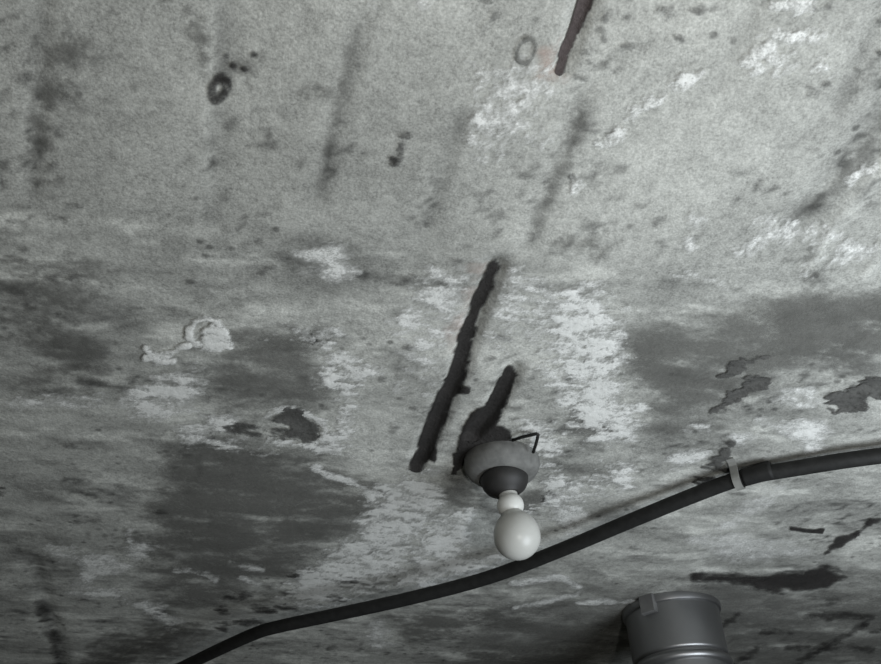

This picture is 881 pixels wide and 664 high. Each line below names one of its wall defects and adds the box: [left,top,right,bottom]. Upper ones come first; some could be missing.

water stain [467,65,554,163]
water stain [595,96,665,148]
water stain [668,71,706,92]
water stain [734,216,881,265]
water stain [387,266,470,380]
water stain [5,392,102,408]
spalling [223,408,319,443]
crack [409,259,518,475]
water stain [482,266,881,535]
spalling [824,377,881,415]
water stain [45,327,505,664]
spalling [691,519,881,593]